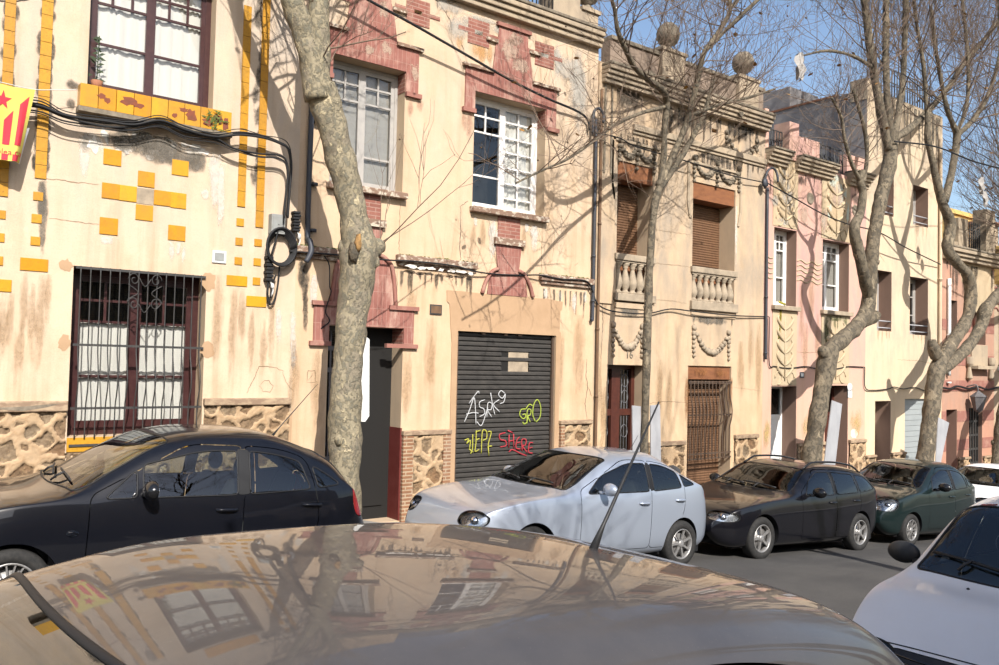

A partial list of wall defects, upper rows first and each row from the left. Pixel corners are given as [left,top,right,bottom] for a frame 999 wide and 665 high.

water stain [79,131,224,220]
peeling [405,264,473,275]